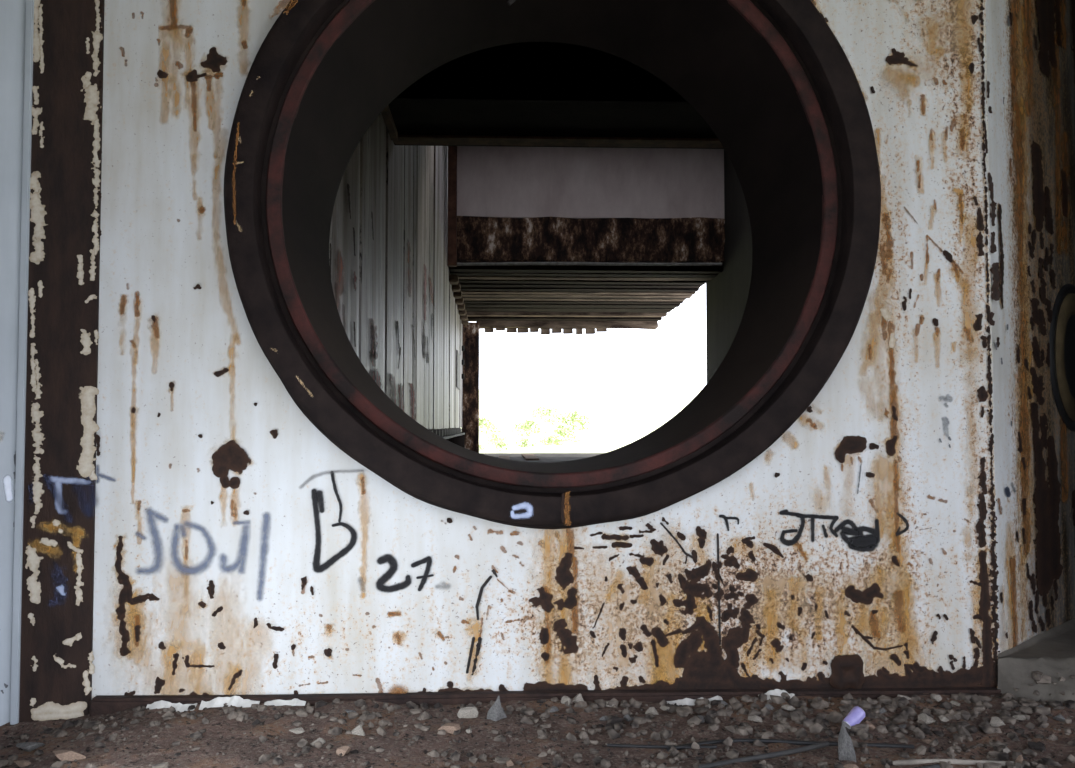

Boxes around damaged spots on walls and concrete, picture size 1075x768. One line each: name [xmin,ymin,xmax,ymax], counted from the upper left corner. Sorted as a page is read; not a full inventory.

rust [154,25,193,116]
peeling [77,0,103,285]
peeling [29,171,48,264]
peeling [25,280,84,626]
peeling [76,386,101,480]
rust [864,236,974,584]
peeling [1024,140,1063,633]
peeling [30,651,95,721]
rust [419,681,508,692]
rust [468,526,524,566]
rust [501,492,679,691]
rust [744,576,998,690]